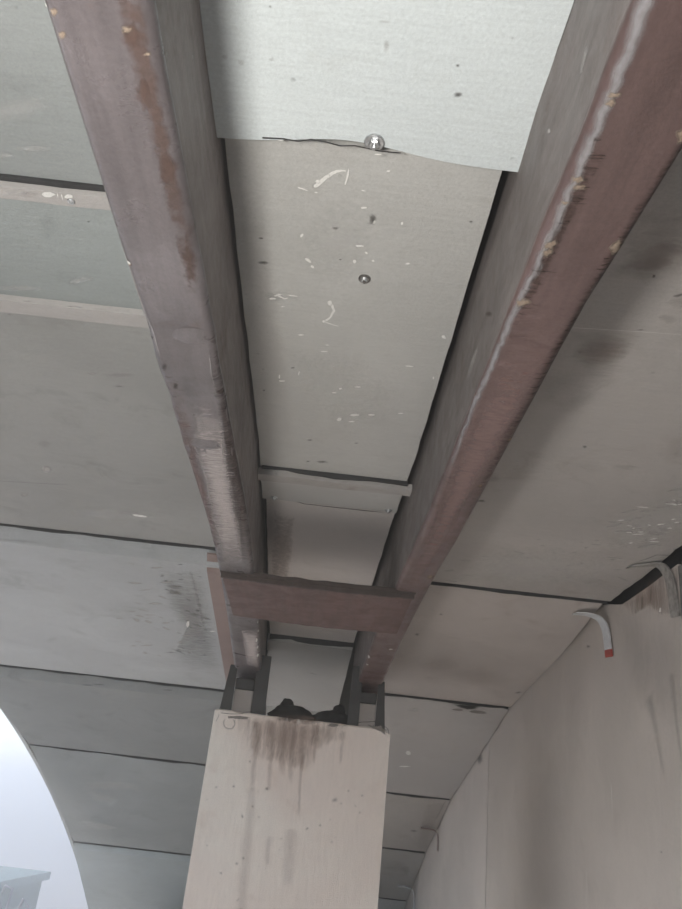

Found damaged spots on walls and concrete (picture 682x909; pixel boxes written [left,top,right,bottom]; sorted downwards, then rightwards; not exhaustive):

rust [123,2,184,223]